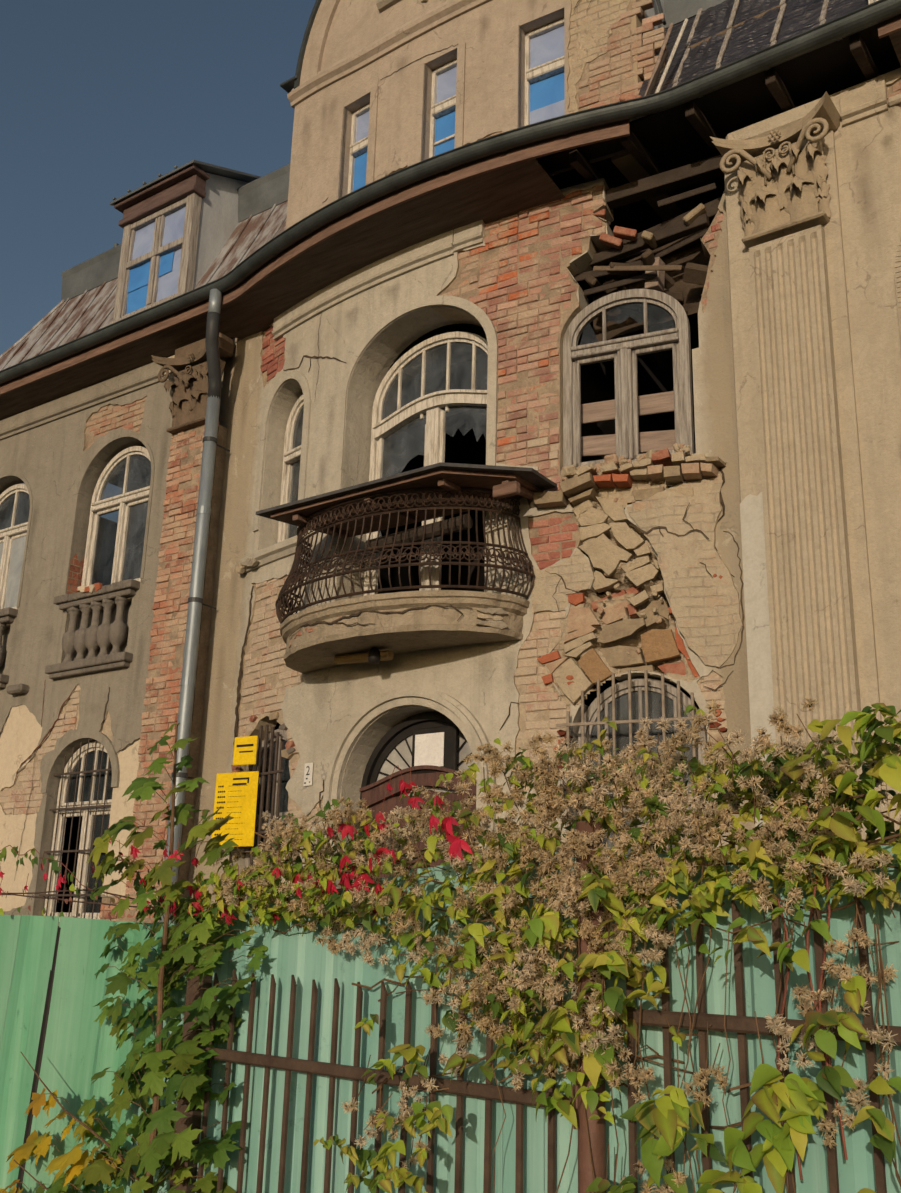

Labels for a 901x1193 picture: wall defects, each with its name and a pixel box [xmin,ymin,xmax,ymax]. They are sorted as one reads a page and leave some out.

flaking render [567,0,667,114]
flaking render [260,325,286,388]
crack [283,312,346,402]
flaking render [430,185,727,796]
crack [233,586,254,754]
flaking render [236,558,317,778]
crack [551,573,581,611]
crack [629,469,744,691]
peeling [0,684,81,911]
peeling [99,711,141,921]
flaking render [231,765,253,773]
flaking render [286,793,323,843]